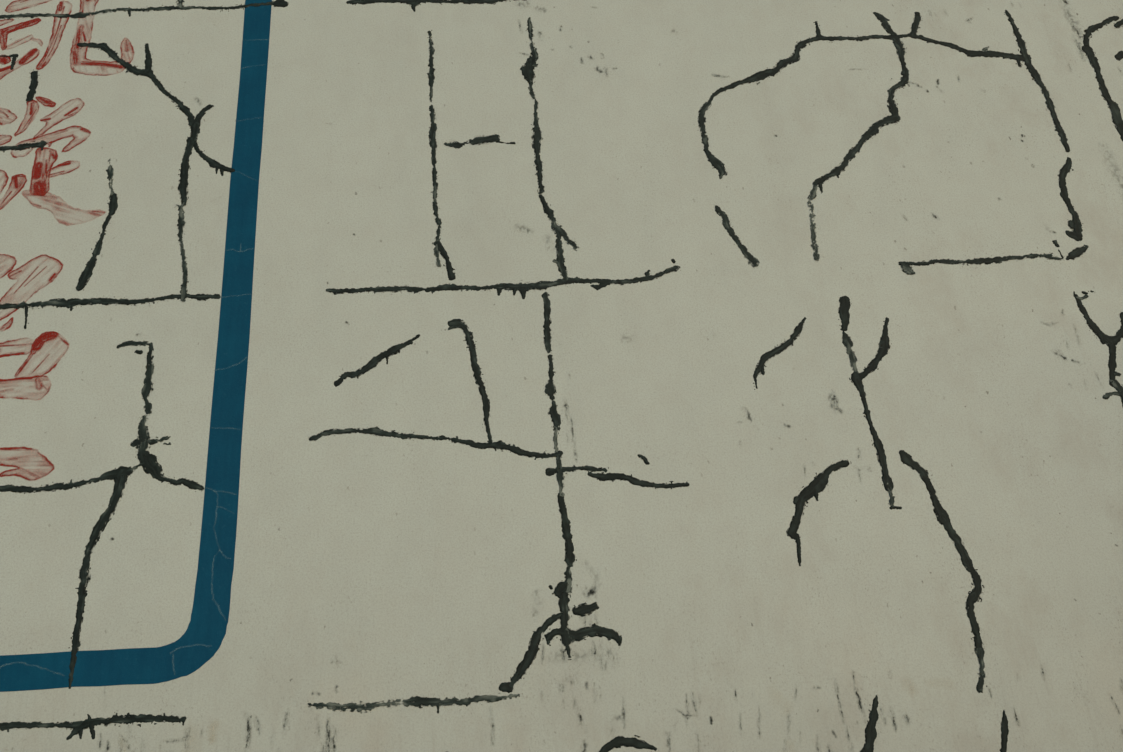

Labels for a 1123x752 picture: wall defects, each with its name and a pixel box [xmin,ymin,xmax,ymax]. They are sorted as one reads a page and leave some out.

crack [1082,16,1123,141]
crack [0,0,289,329]
crack [698,10,1088,275]
crack [308,0,690,714]
crack [753,317,806,390]
crack [1073,290,1123,407]
crack [0,340,204,689]
crack [786,296,987,693]
crack [0,712,186,740]
crack [599,735,657,752]
crack [860,695,879,752]
crack [1000,710,1009,752]